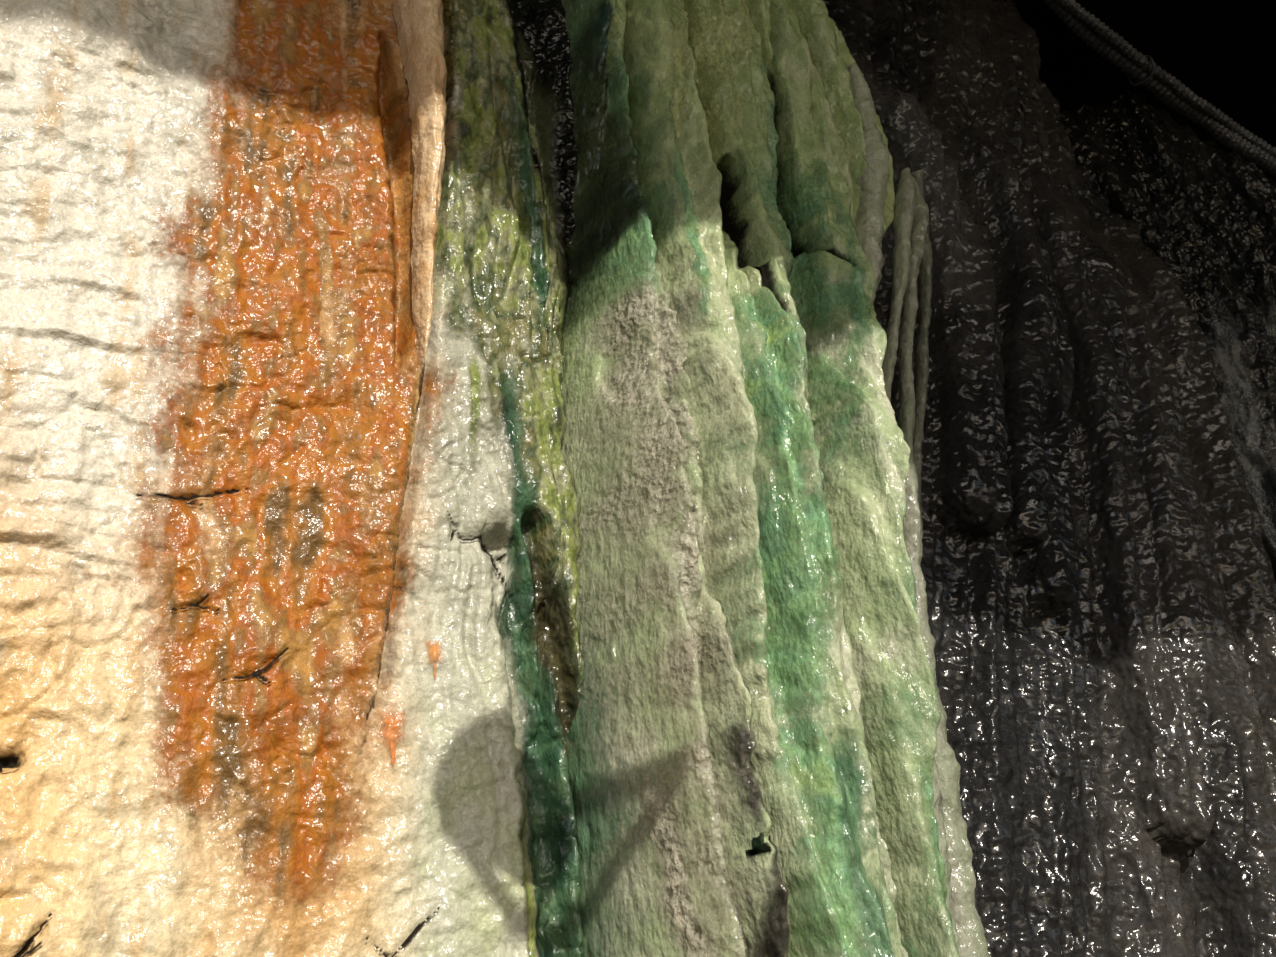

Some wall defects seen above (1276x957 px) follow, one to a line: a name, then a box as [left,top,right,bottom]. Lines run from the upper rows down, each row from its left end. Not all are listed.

water stain [442,0,456,114]
water stain [844,240,871,369]
rust [138,0,439,899]
water stain [469,357,481,454]
water stain [501,0,733,786]
water stain [767,395,806,539]
rust [428,642,441,678]
crack [13,913,53,957]
water stain [518,780,551,957]
water stain [639,725,789,957]
water stain [837,742,920,957]